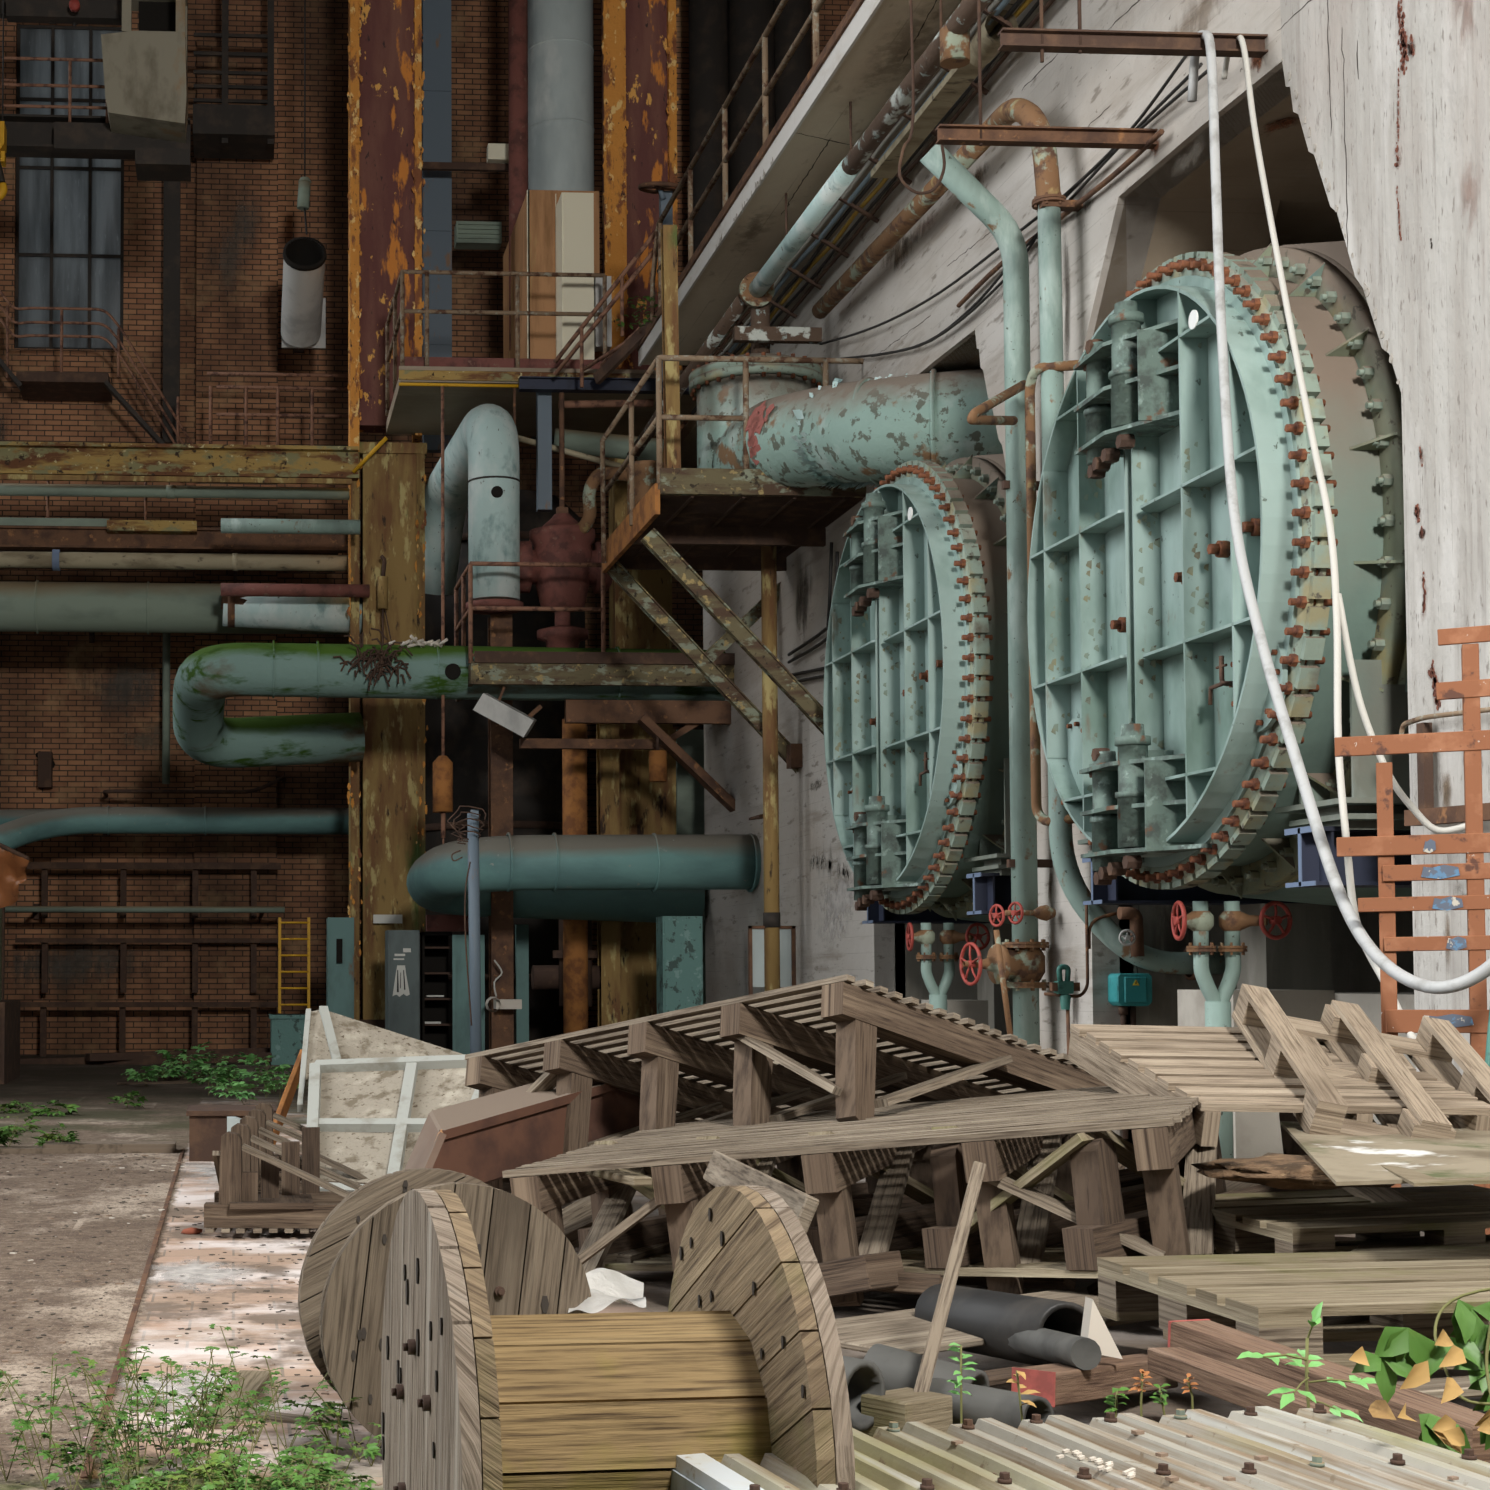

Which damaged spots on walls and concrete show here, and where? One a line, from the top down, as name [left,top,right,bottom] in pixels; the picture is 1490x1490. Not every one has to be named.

rust [601,39,627,97]
rust [347,0,363,426]
rust [411,0,426,357]
rust [603,120,629,169]
peeling [791,378,879,490]